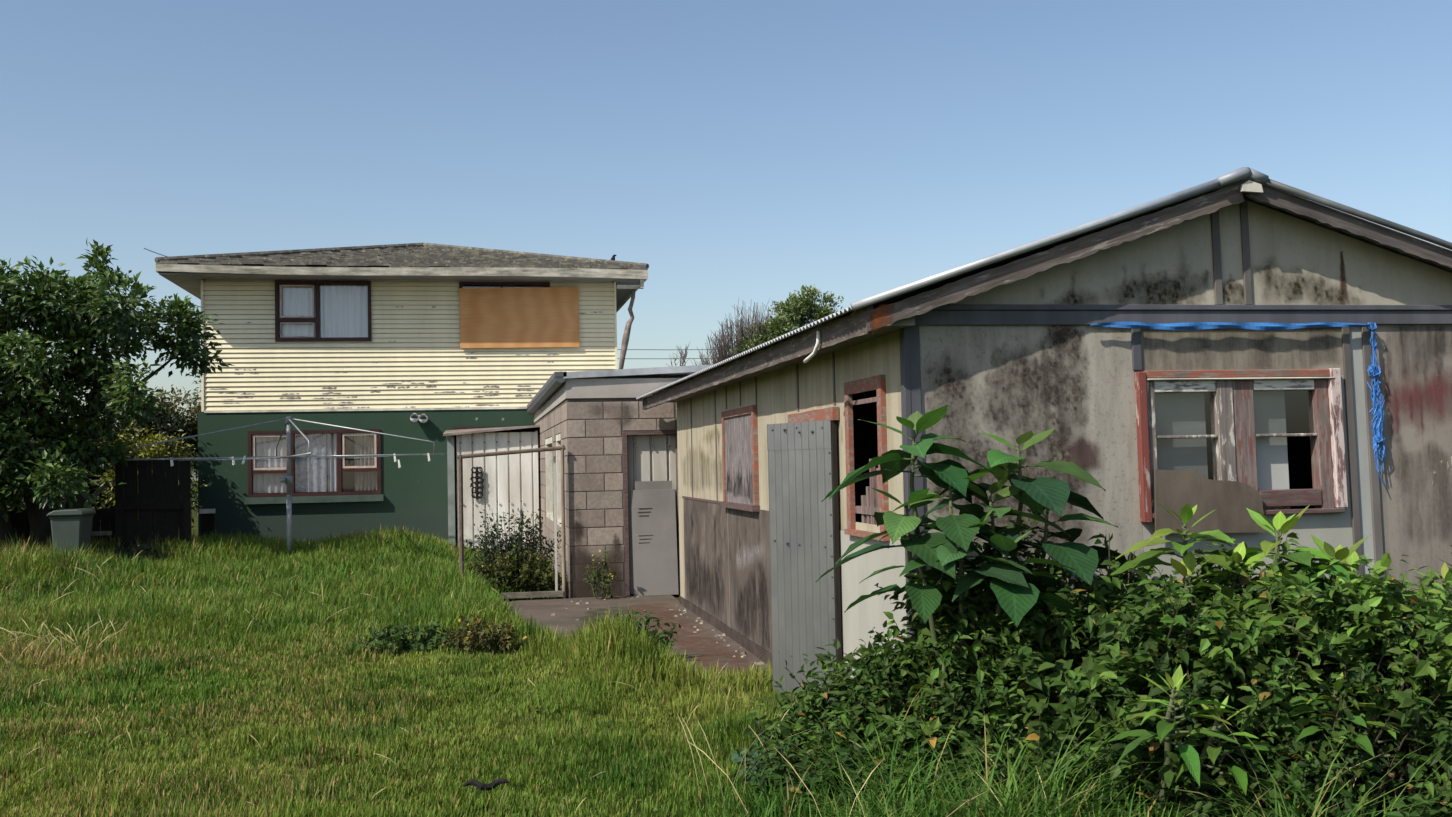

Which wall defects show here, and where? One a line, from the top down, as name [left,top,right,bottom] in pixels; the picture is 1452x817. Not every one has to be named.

water stain [1119,276,1196,305]
water stain [1223,283,1244,304]
peeling [280,368,535,409]
water stain [930,325,1096,552]